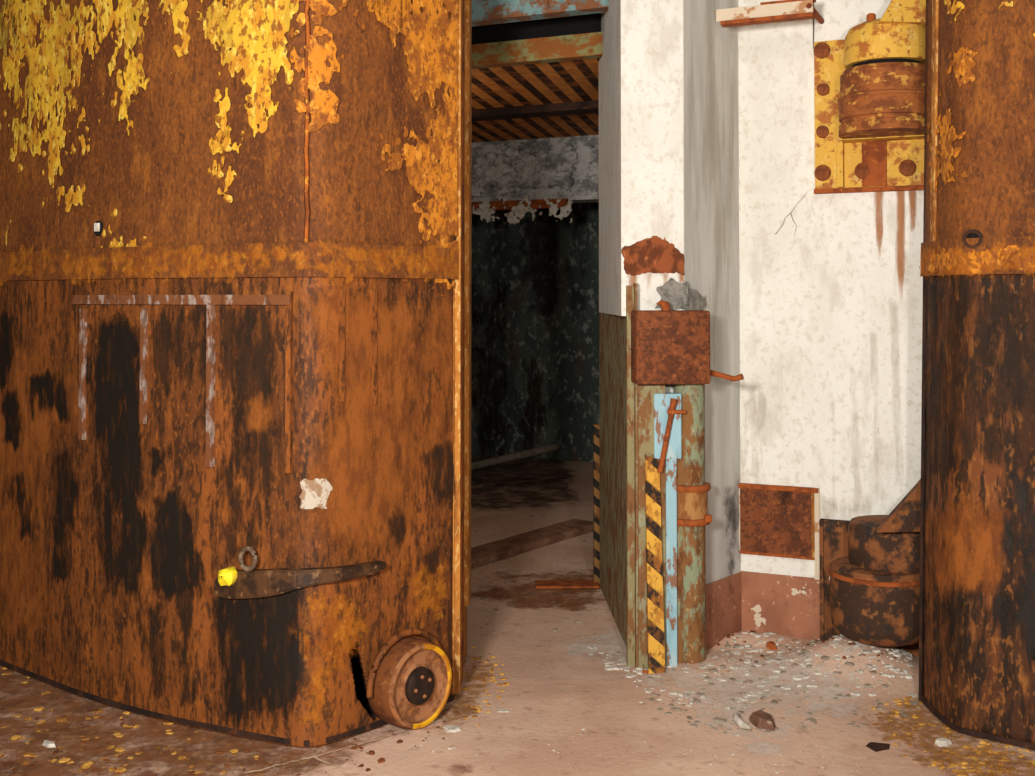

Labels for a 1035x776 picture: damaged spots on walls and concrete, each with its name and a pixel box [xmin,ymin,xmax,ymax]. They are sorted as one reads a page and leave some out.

peeling [944,0,967,24]
peeling [0,0,305,223]
peeling [947,41,982,88]
peeling [94,198,146,248]
corrosion [0,0,458,551]
spalling [471,143,579,225]
corrosion [875,192,883,250]
corrosion [897,191,916,284]
corrosion [0,348,92,625]
corrosion [927,497,1001,591]
corrosion [299,596,366,723]
corrosion [0,666,364,776]